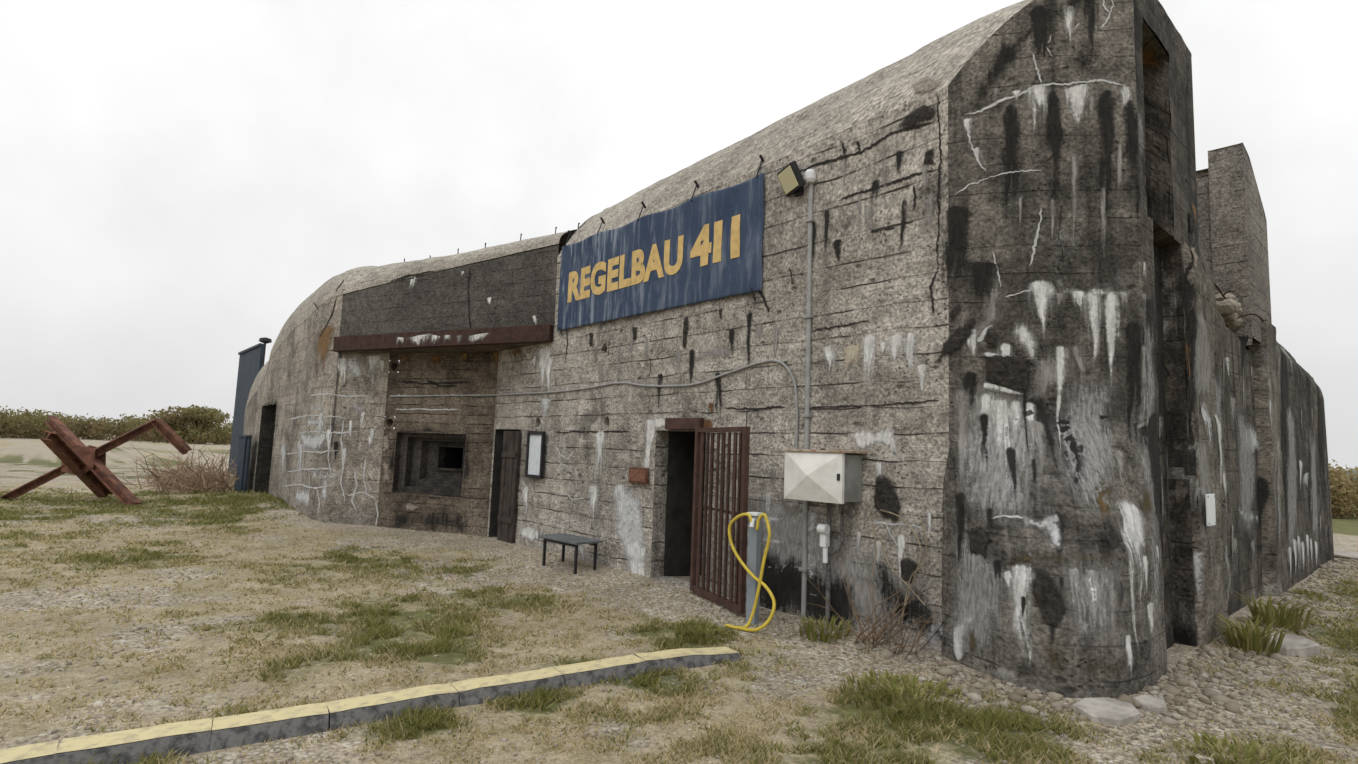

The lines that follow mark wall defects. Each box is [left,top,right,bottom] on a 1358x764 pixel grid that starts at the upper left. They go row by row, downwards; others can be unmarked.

damp [841,144,902,235]
crack [800,0,1128,314]
damp [979,0,1141,241]
damp [748,165,1326,667]